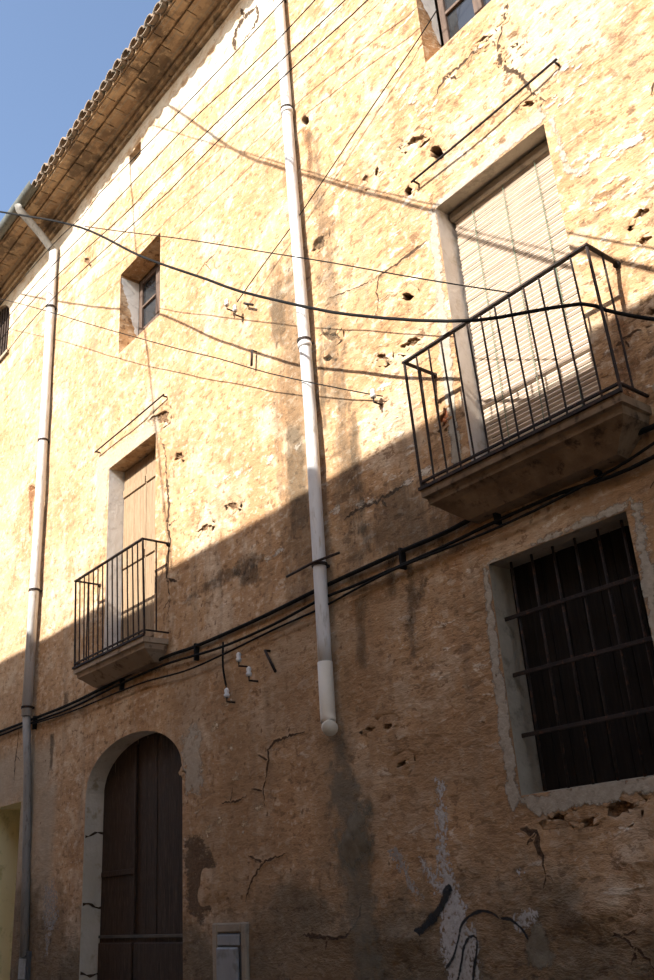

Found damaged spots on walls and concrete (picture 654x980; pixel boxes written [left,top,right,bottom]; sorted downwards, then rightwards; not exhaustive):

crack [433,2,547,104]
crack [646,80,654,95]
crack [160,437,178,620]
spalling [194,495,242,538]
crack [221,729,305,808]
spalling [536,791,654,840]
spalling [183,817,222,925]
crack [244,851,285,903]
crack [520,824,555,890]